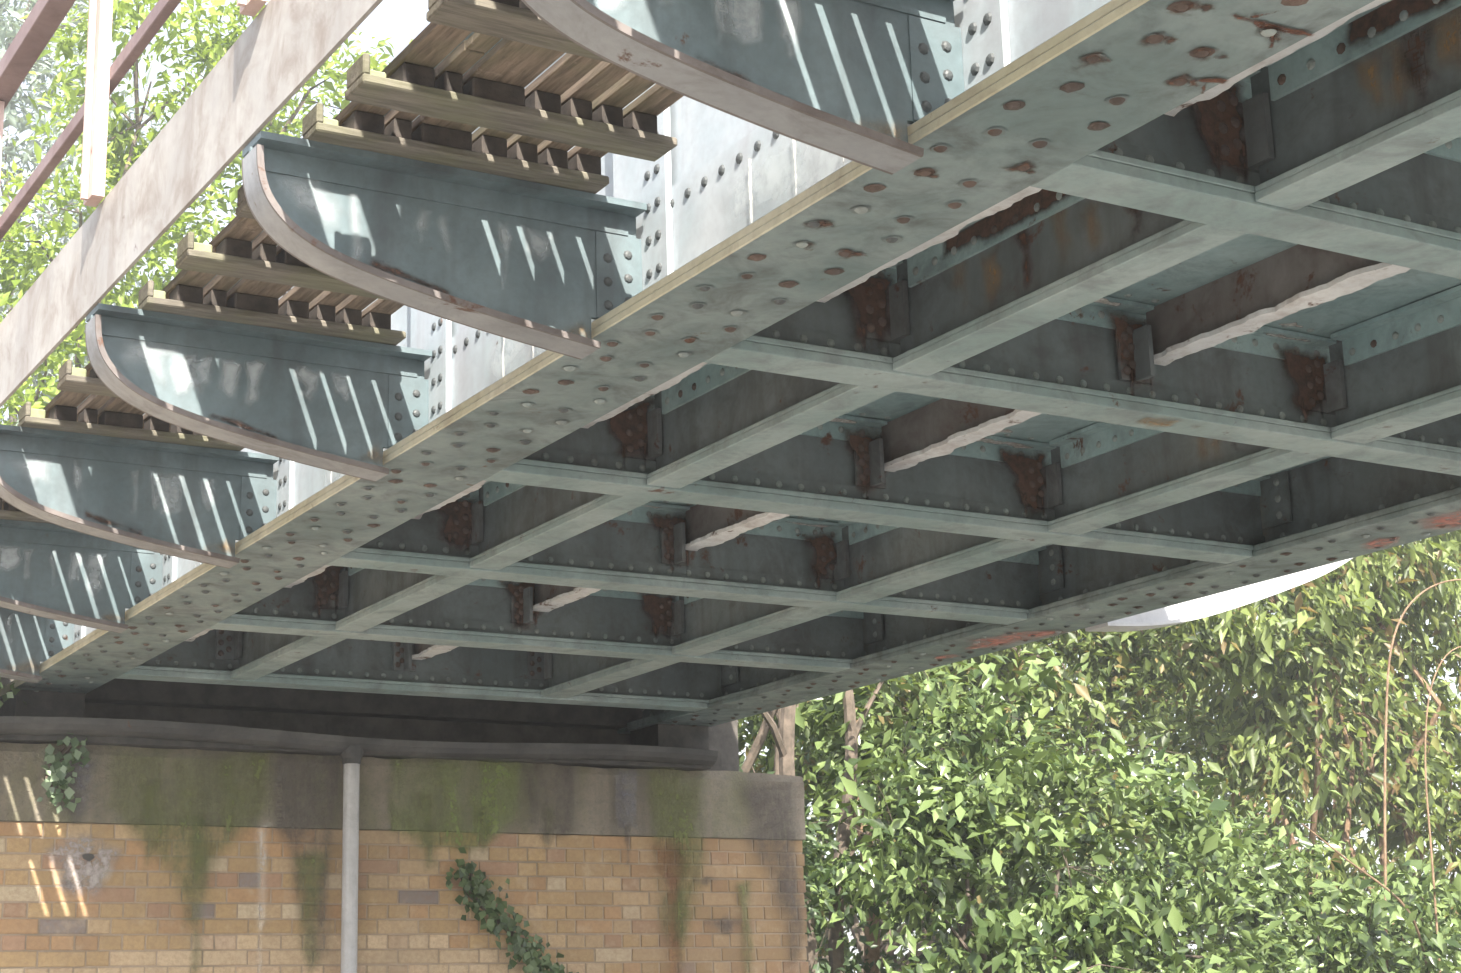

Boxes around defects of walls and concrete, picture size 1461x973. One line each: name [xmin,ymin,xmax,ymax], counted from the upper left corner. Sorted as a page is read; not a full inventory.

rust [1348,0,1461,96]
rust [1167,75,1247,179]
rust [944,162,1070,285]
rust [845,275,893,350]
rust [1278,348,1328,422]
rust [1000,451,1046,516]
rust [312,566,345,617]
rust [501,581,541,627]
rust [641,593,675,637]
spalling [55,839,117,891]
leakage [116,755,335,926]